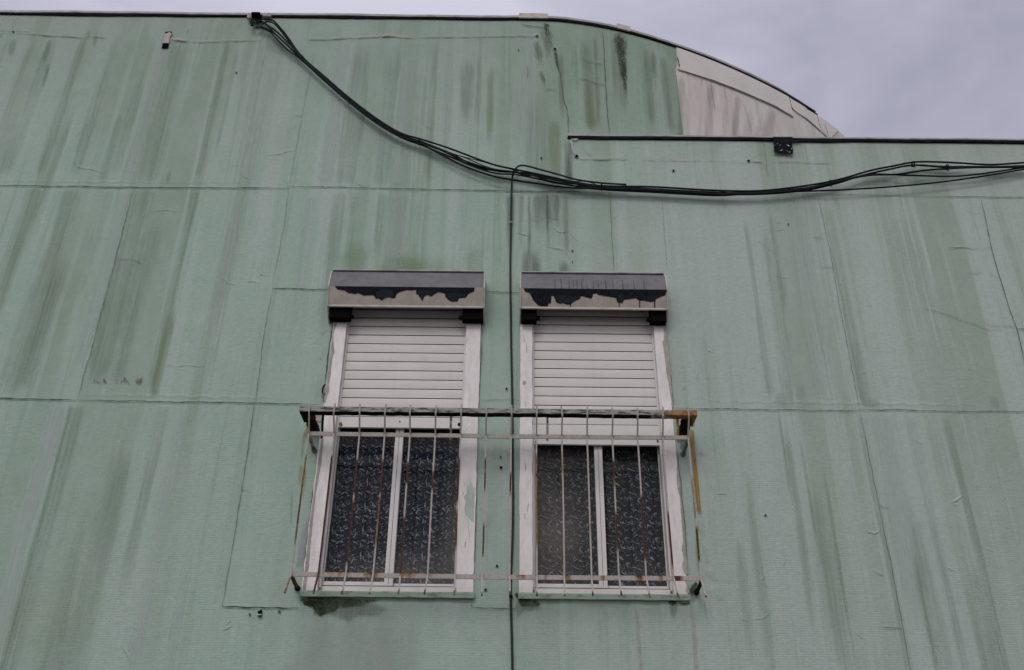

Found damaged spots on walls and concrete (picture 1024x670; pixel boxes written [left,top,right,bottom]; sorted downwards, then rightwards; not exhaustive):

leakage [614,35,627,91]
peeling [335,286,474,302]
peeling [524,288,667,307]
crack [925,196,1024,358]
corrosion [679,420,701,512]
leakage [302,598,374,616]